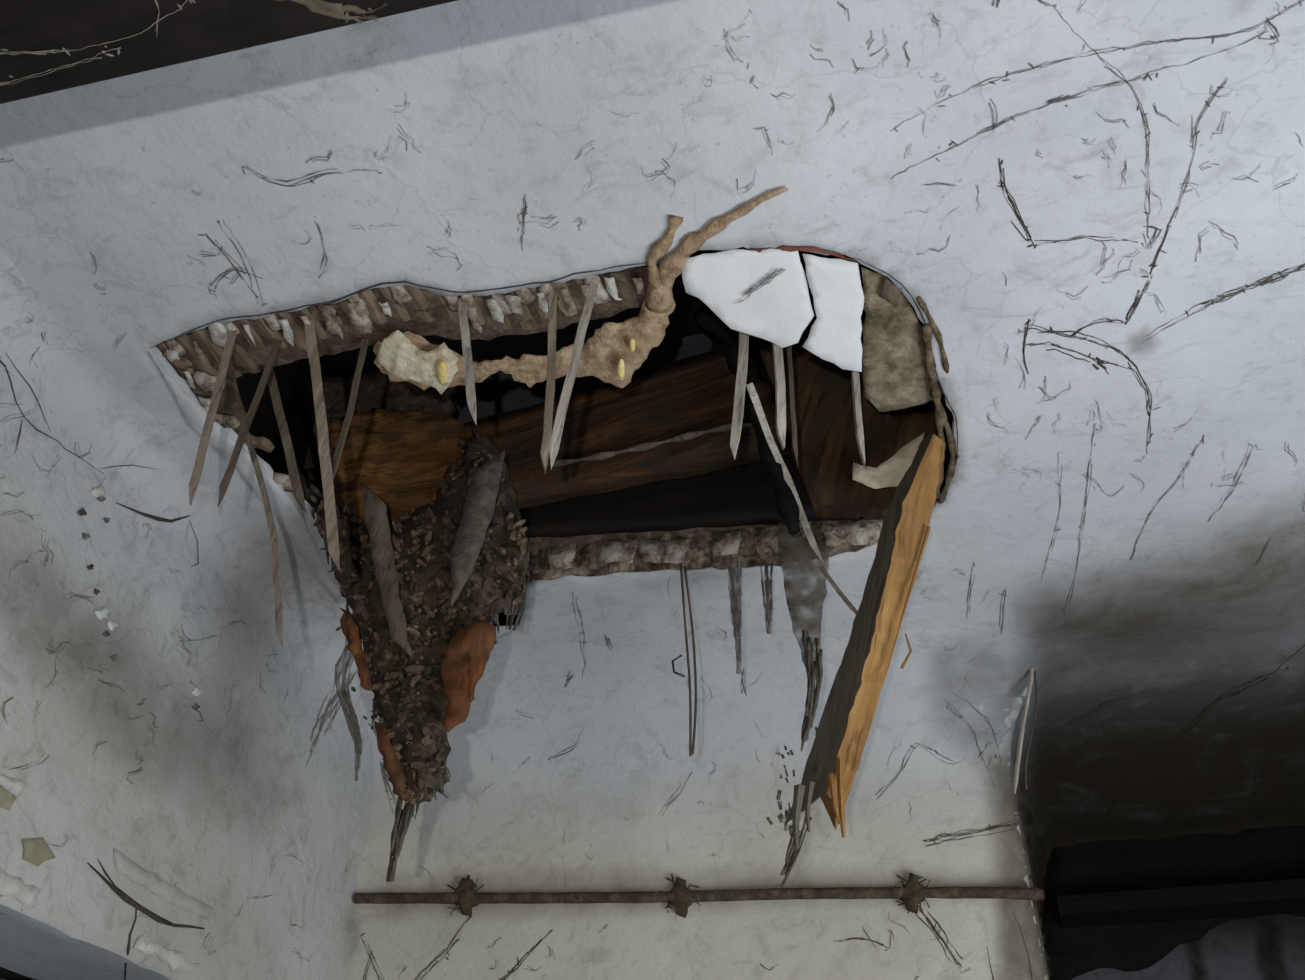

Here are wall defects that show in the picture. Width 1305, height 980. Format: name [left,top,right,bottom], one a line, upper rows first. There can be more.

crack [0,353,199,567]
spalling [149,265,659,604]
spalling [528,517,884,581]
flaking render [682,246,959,504]
crack [858,259,958,462]
leakage [1062,545,1305,637]
peeling [0,773,25,810]
peeling [22,837,56,866]
leakage [998,766,1051,980]